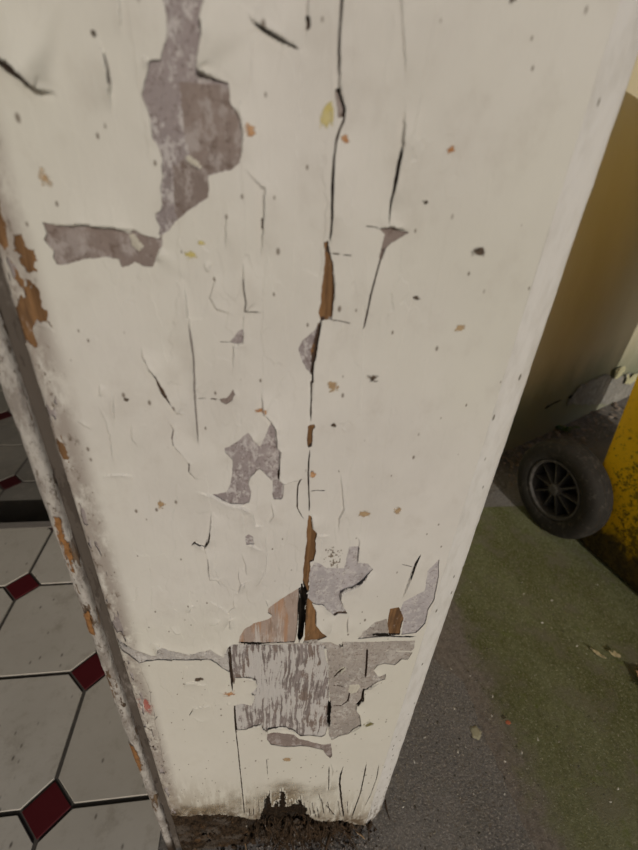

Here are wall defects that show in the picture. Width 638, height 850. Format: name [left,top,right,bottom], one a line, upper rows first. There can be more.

peeling [43,0,333,271]
peeling [33,321,53,336]
peeling [142,350,202,415]
peeling [211,390,242,406]
peeling [198,393,308,532]
crack [228,0,435,818]
peeling [121,537,439,770]